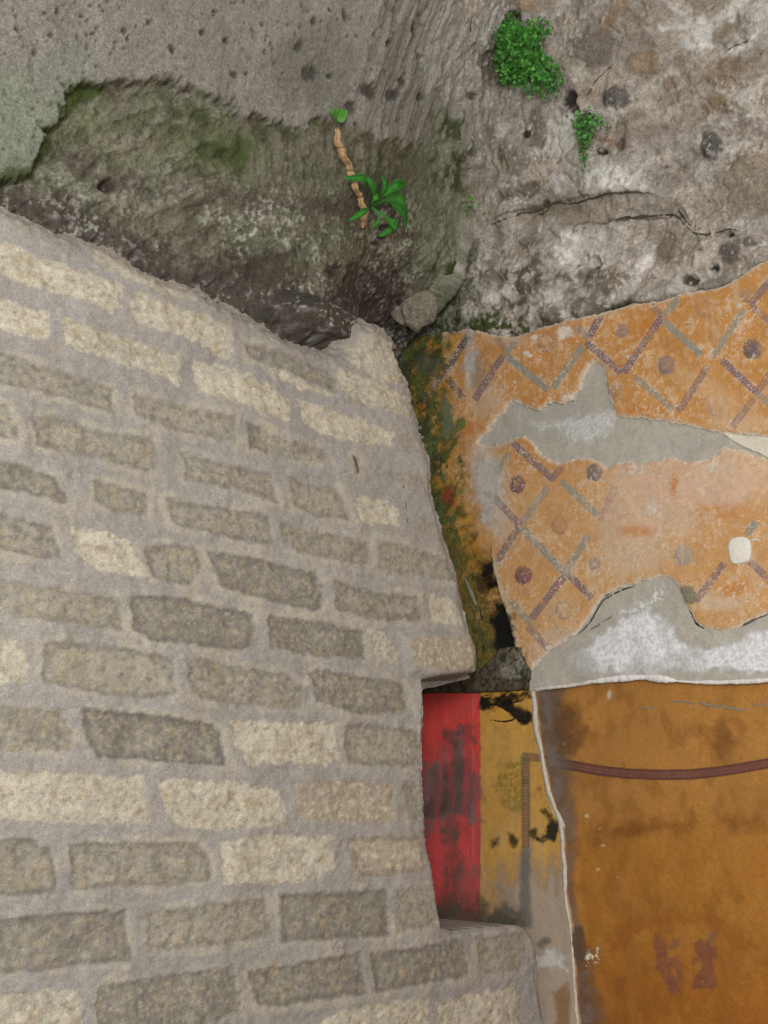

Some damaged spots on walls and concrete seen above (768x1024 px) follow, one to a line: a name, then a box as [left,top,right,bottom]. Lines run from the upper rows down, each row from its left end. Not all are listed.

crack [487,191,739,236]
leakage [440,397,466,440]
flaking render [471,363,768,525]
leakage [422,728,481,843]
leakage [530,689,580,873]
flaking render [496,576,768,1024]
leakage [572,926,600,1024]